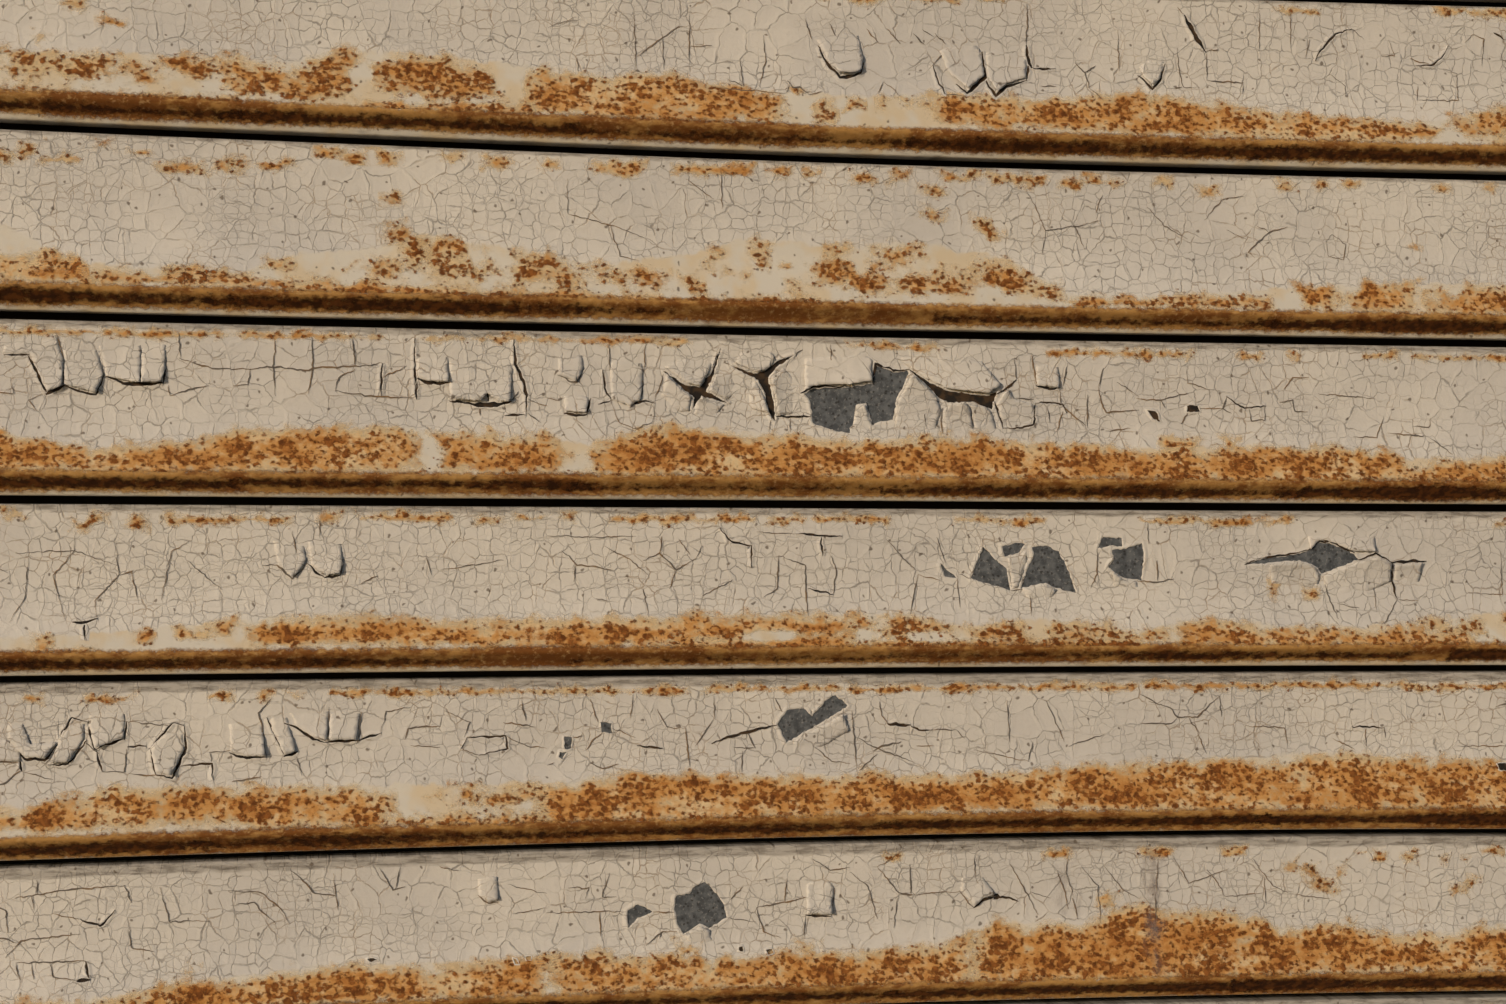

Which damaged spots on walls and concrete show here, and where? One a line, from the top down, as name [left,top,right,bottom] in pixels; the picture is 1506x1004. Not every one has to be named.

crack [1178,8,1244,94]
corrosion [0,35,1506,225]
corrosion [0,191,1506,362]
peeling [3,331,170,410]
crack [168,335,419,398]
peeling [549,340,1060,437]
crack [547,526,843,612]
peeling [886,527,1172,616]
corrosion [0,608,1506,699]
corrosion [0,750,1506,861]
crack [0,870,338,987]
peeling [477,859,850,957]